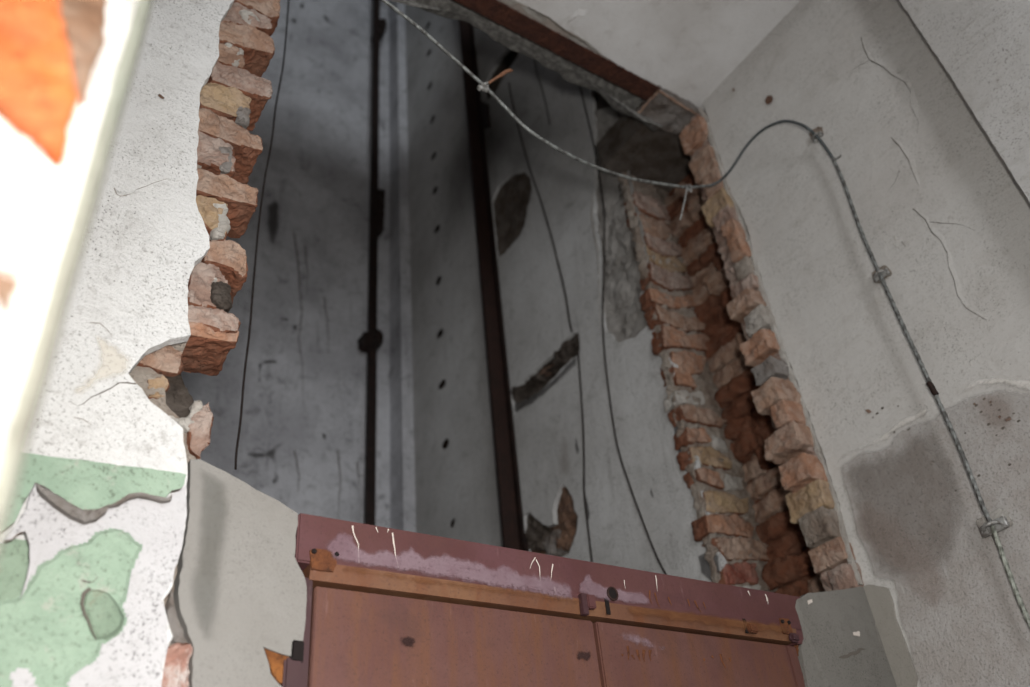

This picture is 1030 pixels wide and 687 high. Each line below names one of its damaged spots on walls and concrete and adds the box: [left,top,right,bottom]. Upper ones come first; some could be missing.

peeling [269,202,277,239]
spalling [594,106,649,343]
crack [854,38,988,320]
peeling [0,453,187,687]
spalling [525,487,590,557]
peeling [699,553,720,580]
damp [842,378,1030,687]